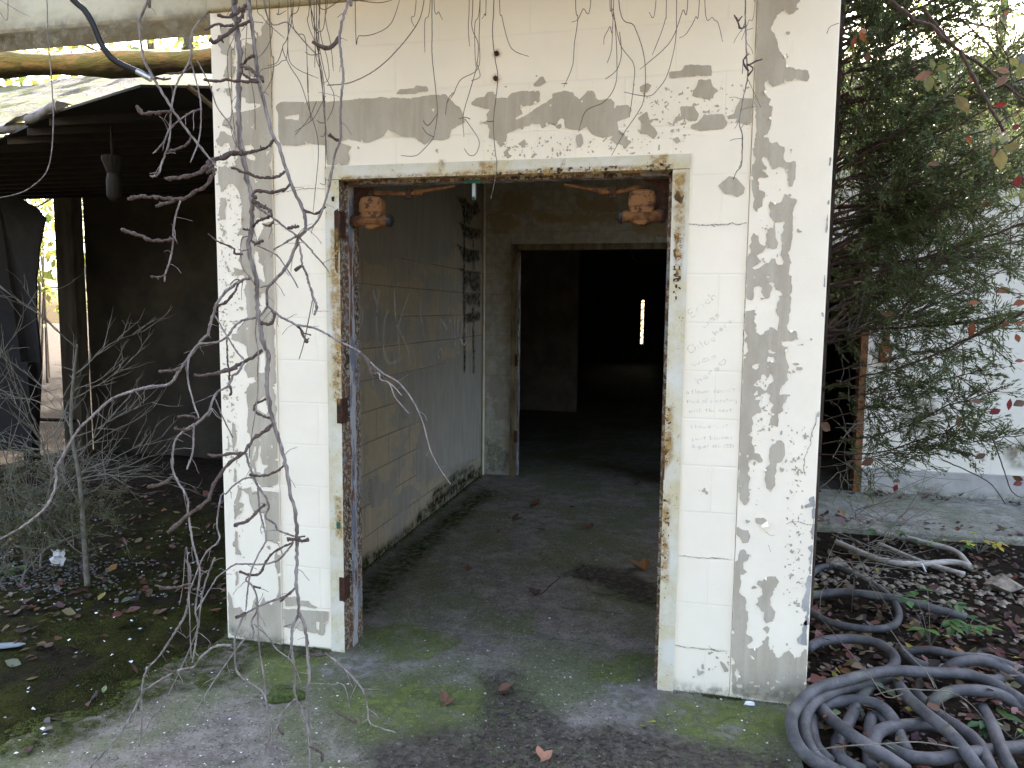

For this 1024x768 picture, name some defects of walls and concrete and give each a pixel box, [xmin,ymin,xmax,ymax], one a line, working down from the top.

corrosion [441,155,685,300]
corrosion [331,230,341,403]
peeling [157,0,815,768]
corrosion [664,407,672,466]
corrosion [661,499,670,579]